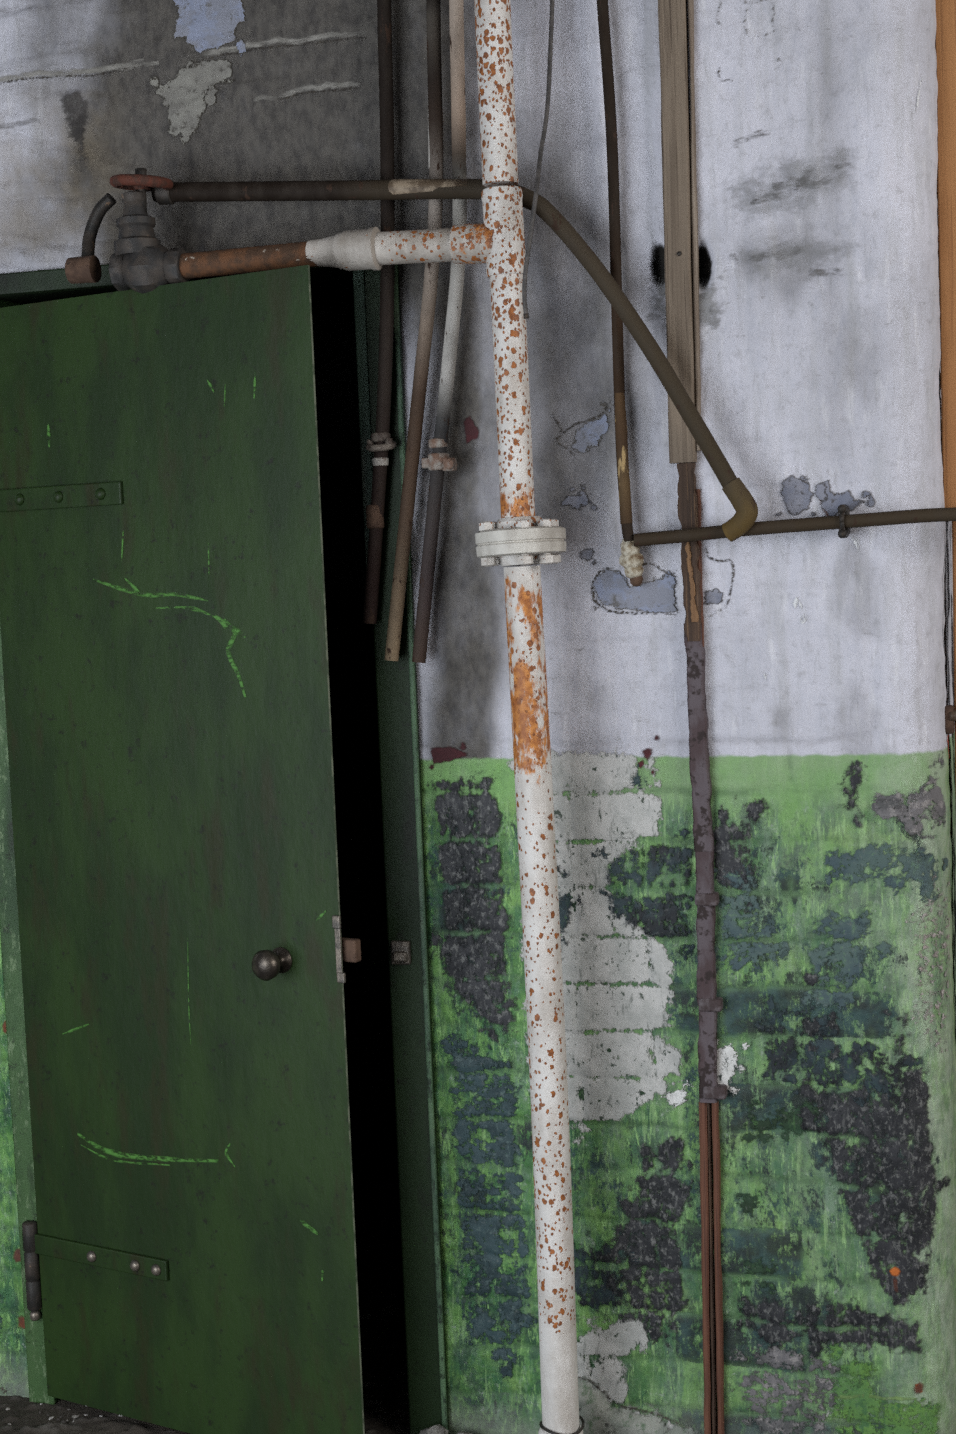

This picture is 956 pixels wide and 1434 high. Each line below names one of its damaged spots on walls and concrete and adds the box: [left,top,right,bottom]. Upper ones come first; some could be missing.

peeling [149,0,246,146]
peeling [580,548,678,615]
peeling [704,588,723,605]
peeling [551,735,694,1148]
peeling [713,752,951,1434]
peeling [574,1135,700,1434]